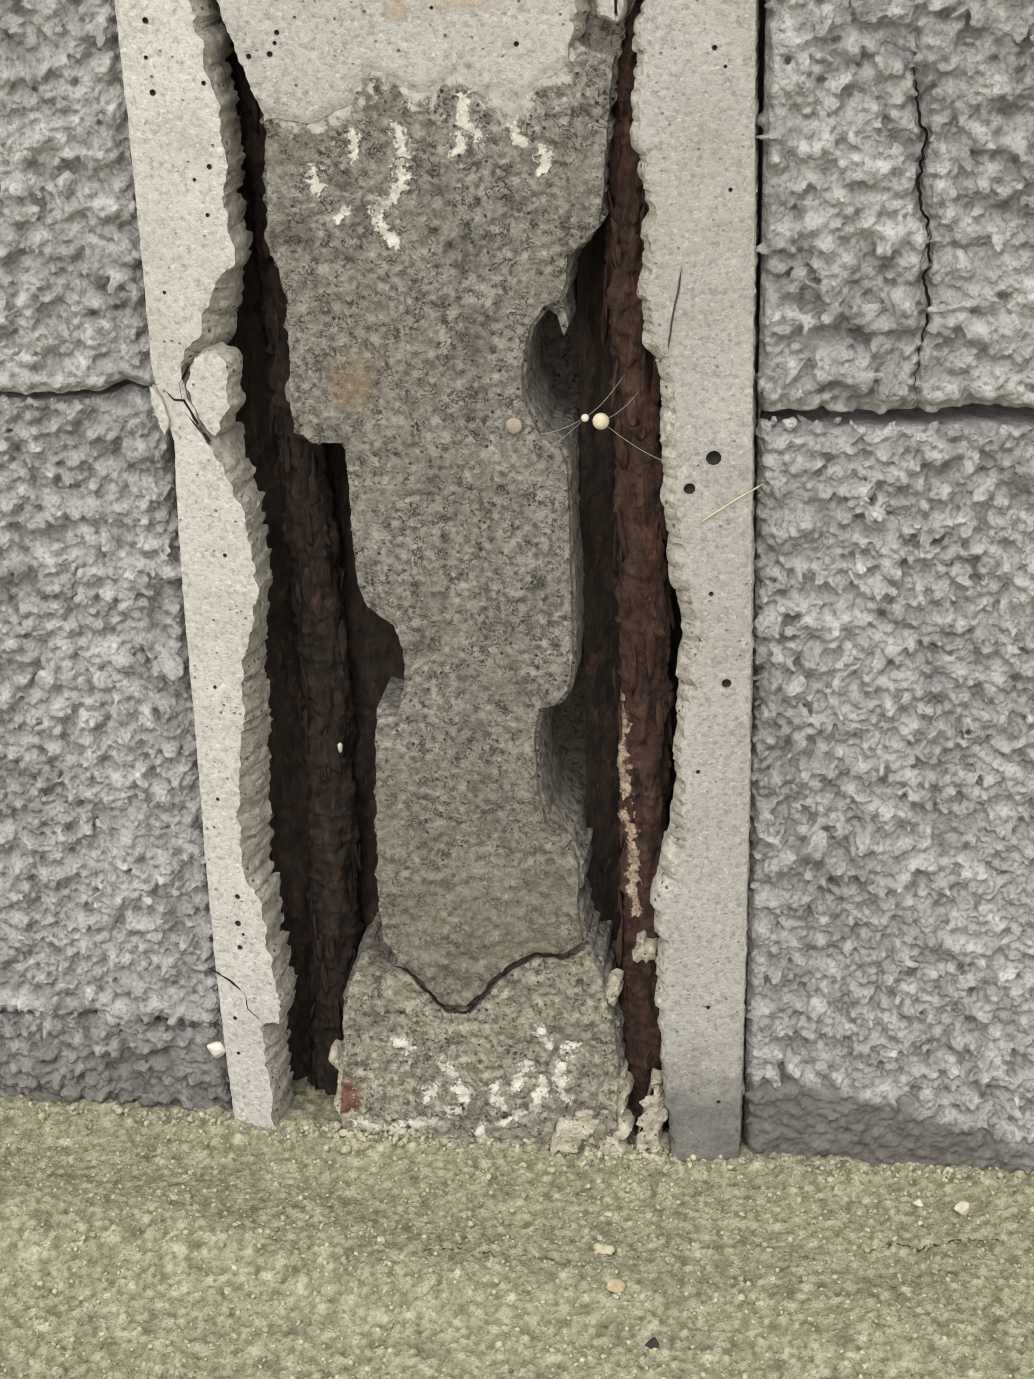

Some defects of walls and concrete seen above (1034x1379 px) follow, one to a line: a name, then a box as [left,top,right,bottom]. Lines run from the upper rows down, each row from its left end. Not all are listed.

corrosion [618,91,633,123]
corrosion [601,137,645,346]
crack [164,366,211,445]
corrosion [610,339,661,470]
peeling [115,0,760,1161]
corrosion [654,499,668,542]
corrosion [613,597,675,1000]
crack [387,948,586,1014]